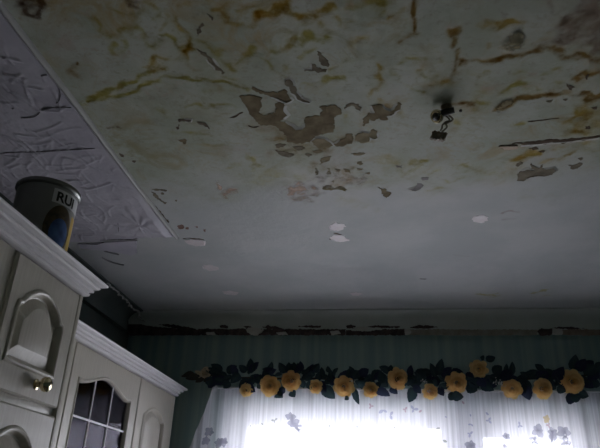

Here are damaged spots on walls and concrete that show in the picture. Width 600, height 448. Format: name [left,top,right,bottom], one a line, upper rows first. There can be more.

peeling [239,77,402,175]
crack [499,135,600,150]
peeling [516,161,559,182]
peeling [329,222,350,242]
peeling [127,324,600,336]